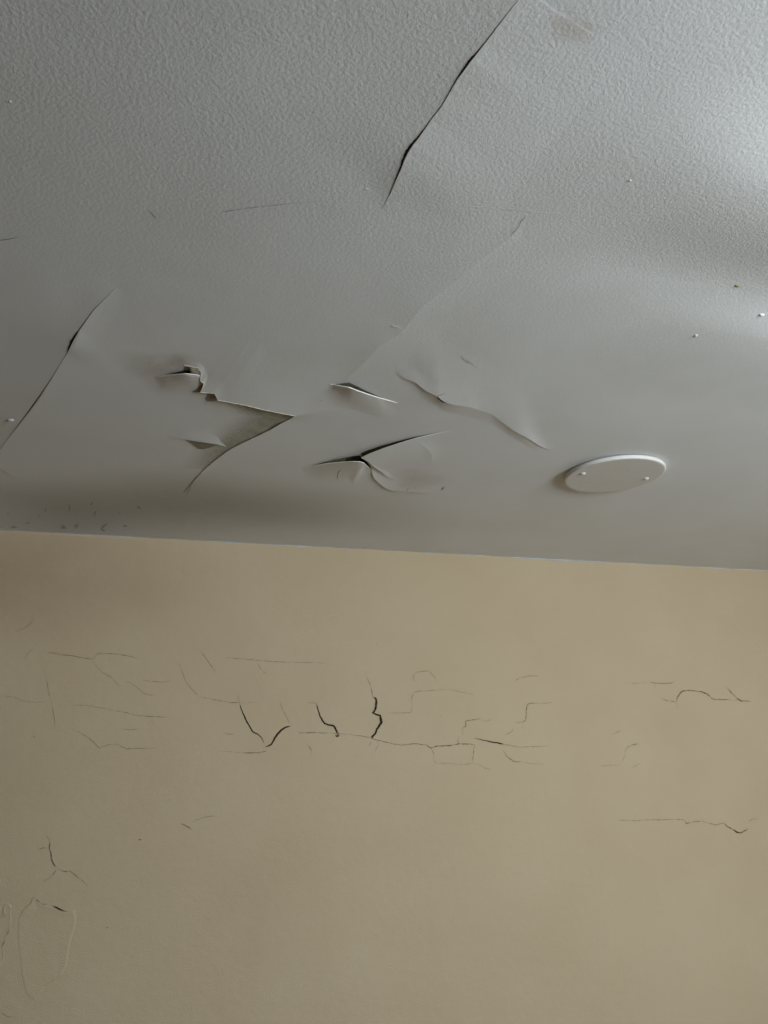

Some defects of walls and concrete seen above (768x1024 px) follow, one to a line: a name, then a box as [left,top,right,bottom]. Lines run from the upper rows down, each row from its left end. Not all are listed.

peeling [395,324,555,453]